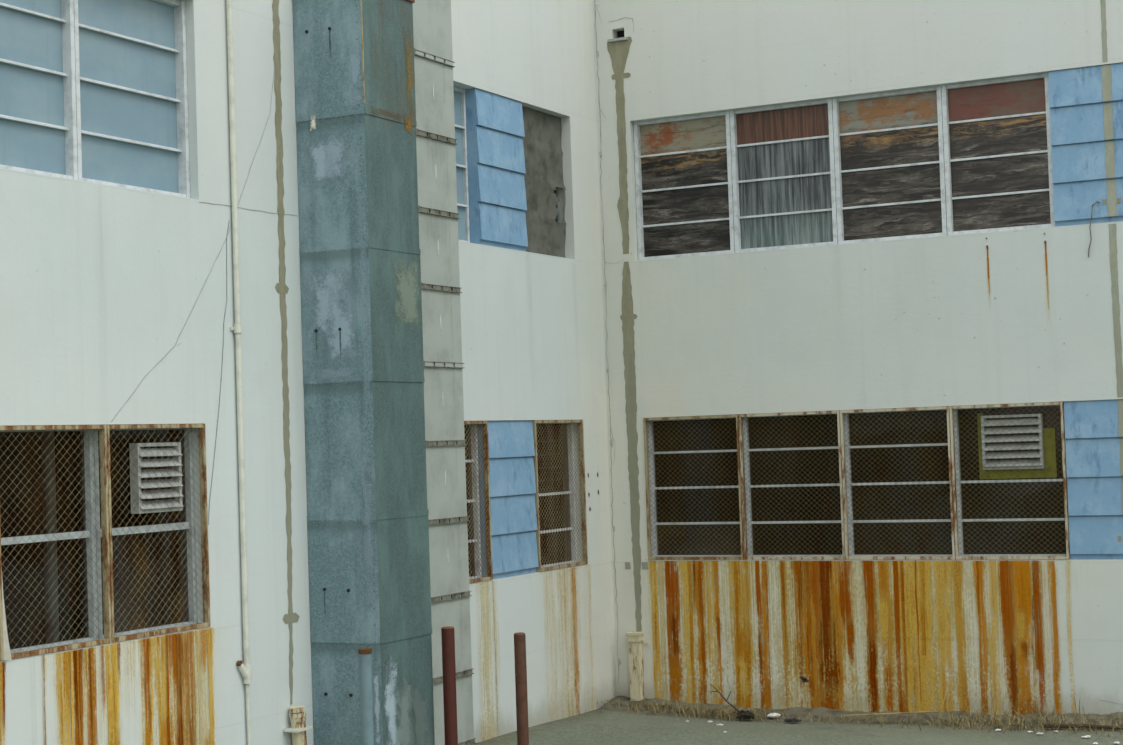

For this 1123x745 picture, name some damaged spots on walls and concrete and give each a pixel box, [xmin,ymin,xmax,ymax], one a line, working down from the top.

crack [111,69,297,422]
corrosion [43,643,120,745]
corrosion [140,628,215,745]
corrosion [572,567,580,715]
corrosion [649,560,1075,717]